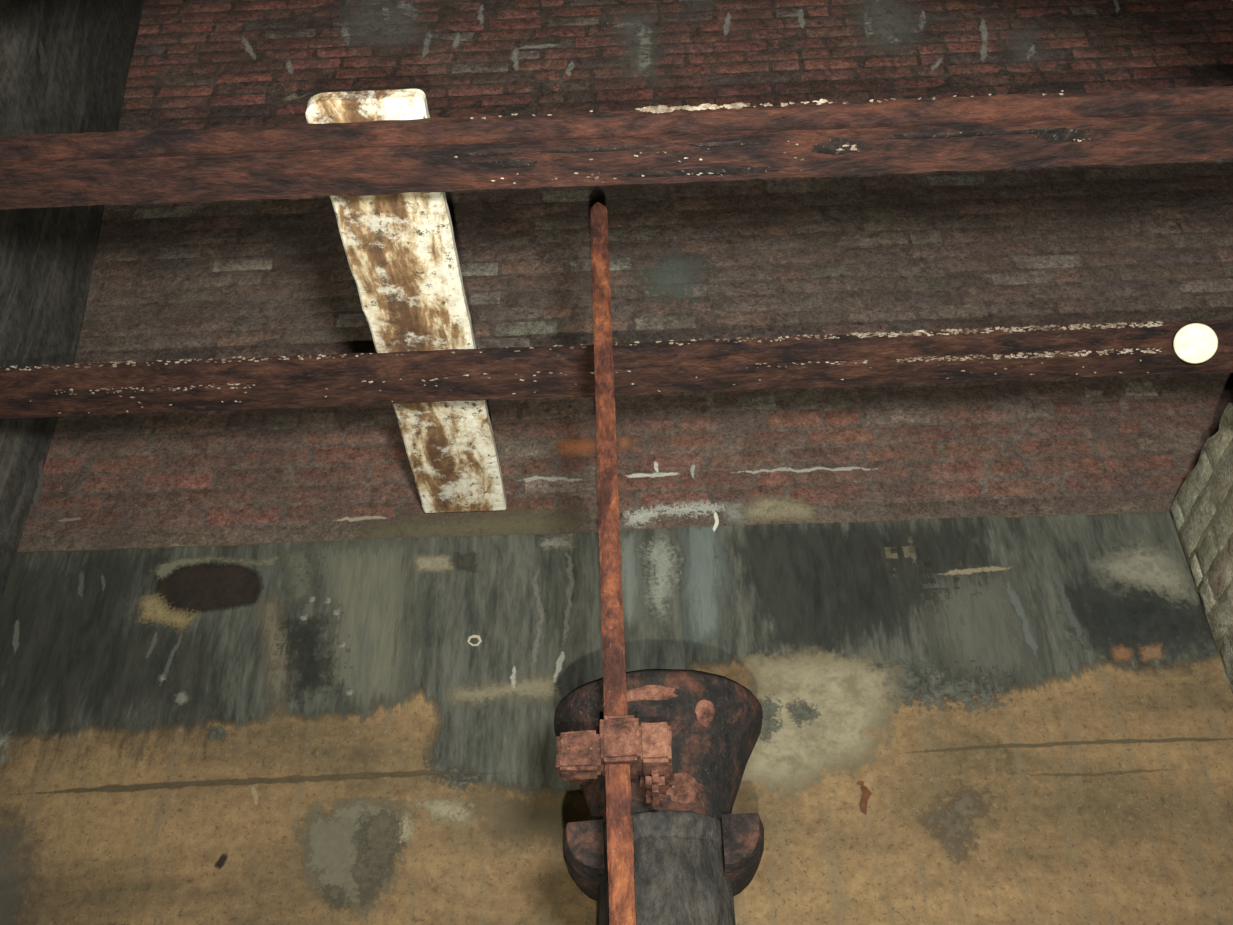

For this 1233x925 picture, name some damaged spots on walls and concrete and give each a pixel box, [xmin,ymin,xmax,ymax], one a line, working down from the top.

rust [635,99,848,113]
rust [656,321,1163,345]
rust [0,350,410,371]
rust [897,347,1162,379]
rust [55,383,255,412]
water stain [620,494,820,646]
water stain [878,538,923,576]
water stain [1090,534,1198,602]
water stain [255,504,588,720]
water stain [920,563,1048,694]
rust [627,685,678,701]
rust [695,699,715,727]